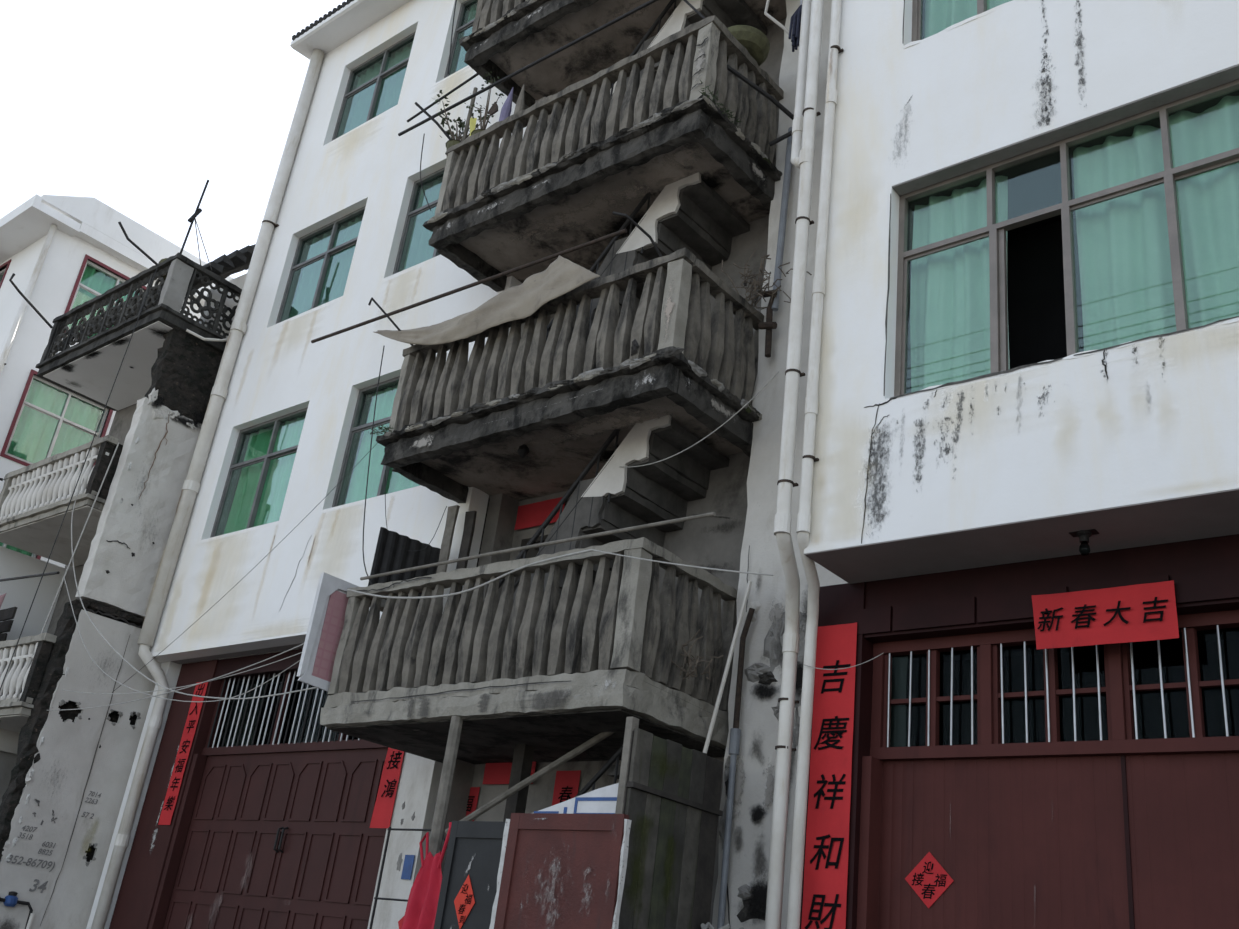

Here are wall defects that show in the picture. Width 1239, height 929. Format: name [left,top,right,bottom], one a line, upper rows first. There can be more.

water stain [1038,0,1053,125]
water stain [1074,0,1086,92]
crack [139,413,170,499]
water stain [865,426,891,523]
water stain [915,392,974,482]
spalling [58,699,90,722]
spalling [106,709,141,729]
spalling [83,843,98,866]